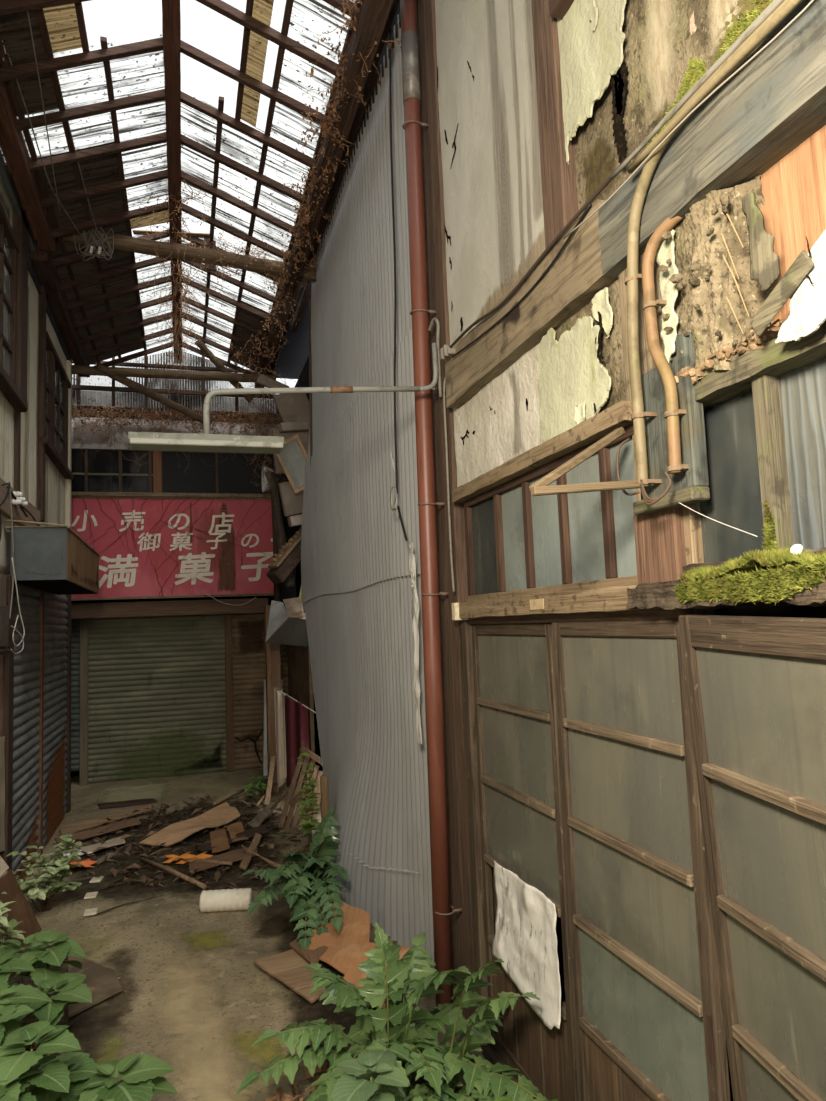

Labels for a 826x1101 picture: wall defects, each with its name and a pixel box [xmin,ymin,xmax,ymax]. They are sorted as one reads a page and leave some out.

peeling [557,0,626,164]
crack [610,63,628,164]
leakage [646,0,671,141]
leakage [711,0,738,46]
peeling [536,287,613,444]